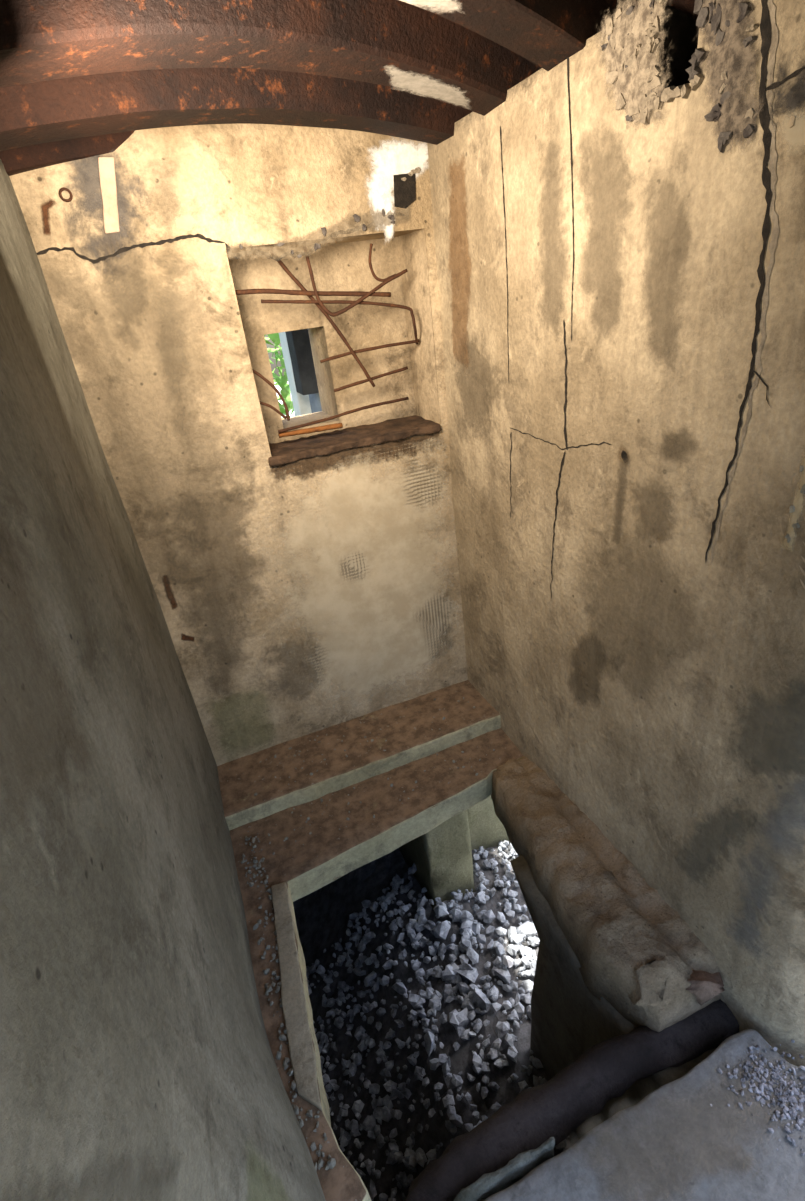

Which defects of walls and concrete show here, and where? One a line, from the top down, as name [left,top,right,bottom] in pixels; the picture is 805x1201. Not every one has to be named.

spalling [600,0,763,153]
water stain [770,61,805,121]
crack [37,234,311,264]
spalling [227,167,420,392]
crack [705,0,805,565]
spalling [252,369,409,438]